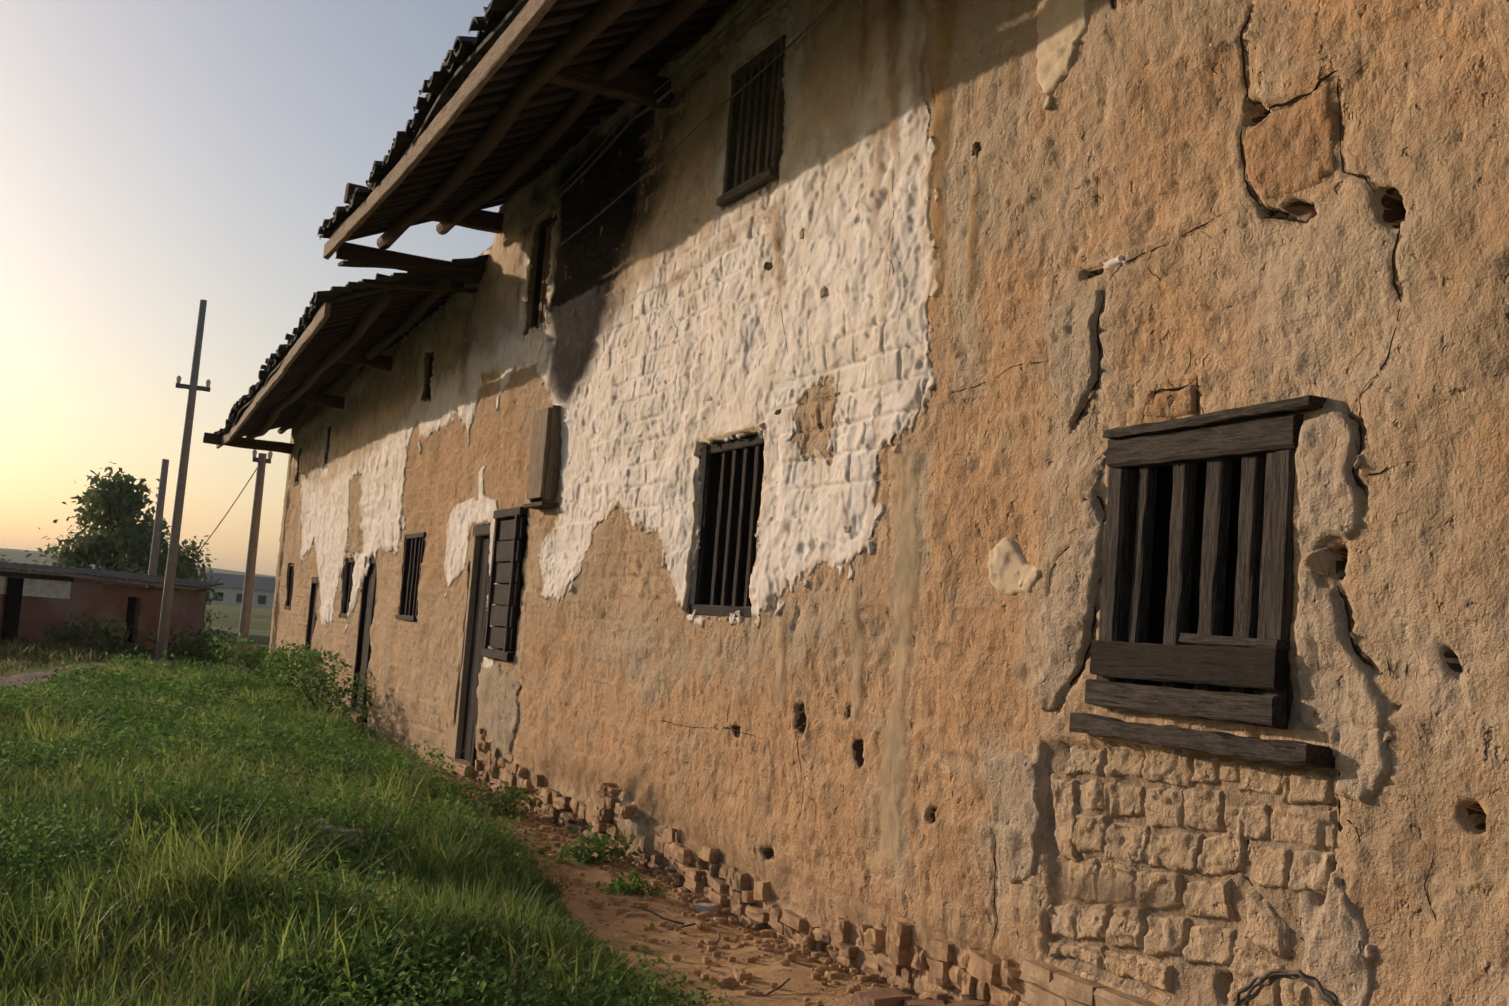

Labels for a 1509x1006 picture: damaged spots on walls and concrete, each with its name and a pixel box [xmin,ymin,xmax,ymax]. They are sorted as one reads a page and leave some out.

leakage [805,0,897,137]
leakage [290,193,544,482]
peeling [292,0,943,637]
leakage [551,27,735,397]
crack [952,6,1402,497]
spalling [1243,81,1339,223]
hole [1381,188,1406,229]
peeling [483,646,499,668]
spalling [796,704,807,734]
crack [1057,578,1101,710]
crack [1337,585,1375,669]
crack [983,843,998,952]